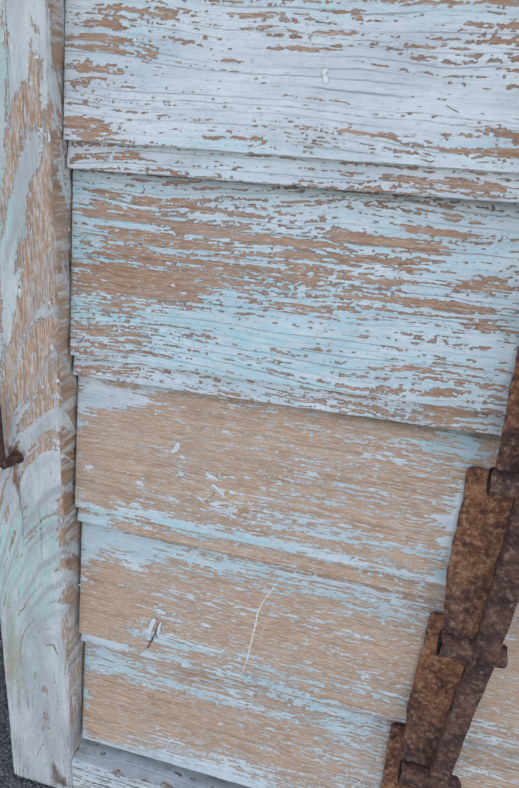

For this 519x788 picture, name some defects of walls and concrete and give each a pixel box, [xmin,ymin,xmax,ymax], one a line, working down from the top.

peeling [1,11,9,60]
peeling [162,25,203,47]
peeling [226,0,384,53]
peeling [362,0,519,90]
peeling [179,114,276,157]
peeling [339,162,419,170]
peeling [270,334,331,357]
peeling [394,331,491,357]
peeling [247,357,294,378]
rust [8,447,23,492]
peeling [0,467,13,525]
peeling [63,761,152,788]